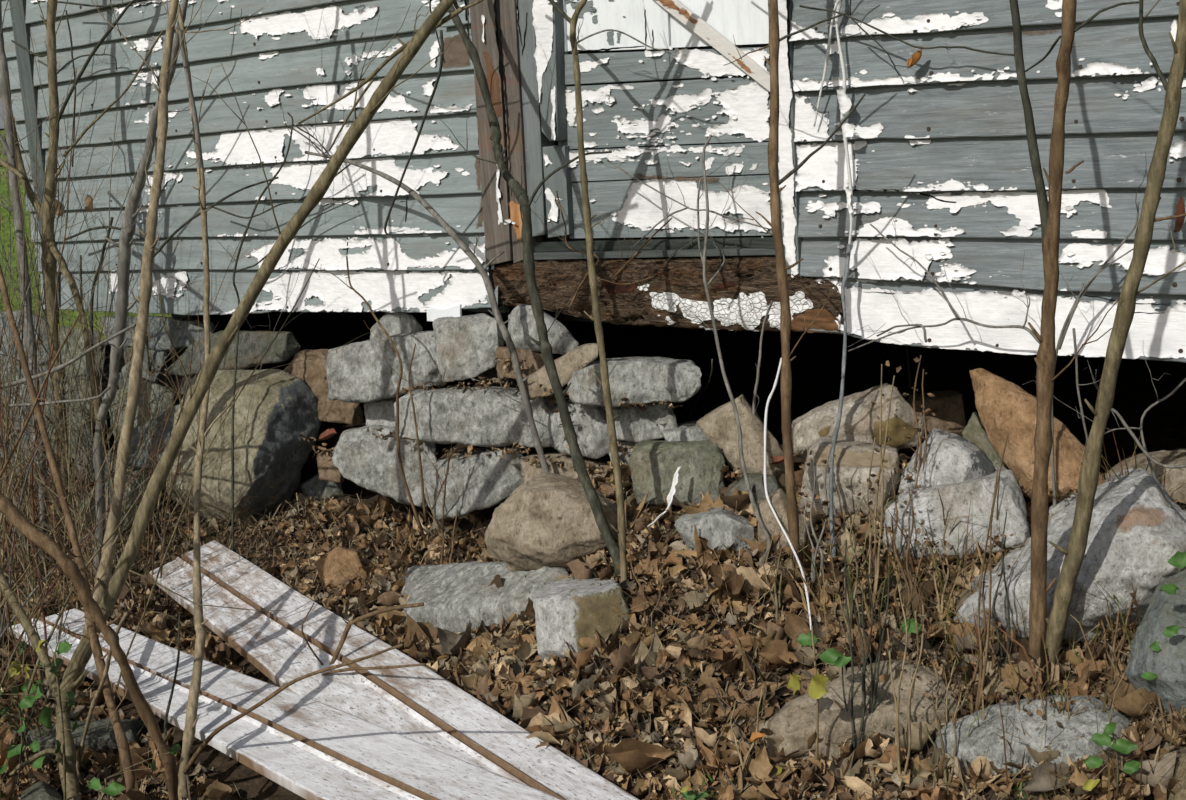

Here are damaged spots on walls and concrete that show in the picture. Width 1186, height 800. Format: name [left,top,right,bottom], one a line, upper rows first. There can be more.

peeling [217,0,378,59]
peeling [1071,58,1162,99]
peeling [137,36,472,222]
peeling [516,0,1134,357]
peeling [1169,140,1186,161]
peeling [217,220,489,313]
peeling [1143,246,1186,276]
crack [637,284,813,332]
peeling [1122,296,1186,359]